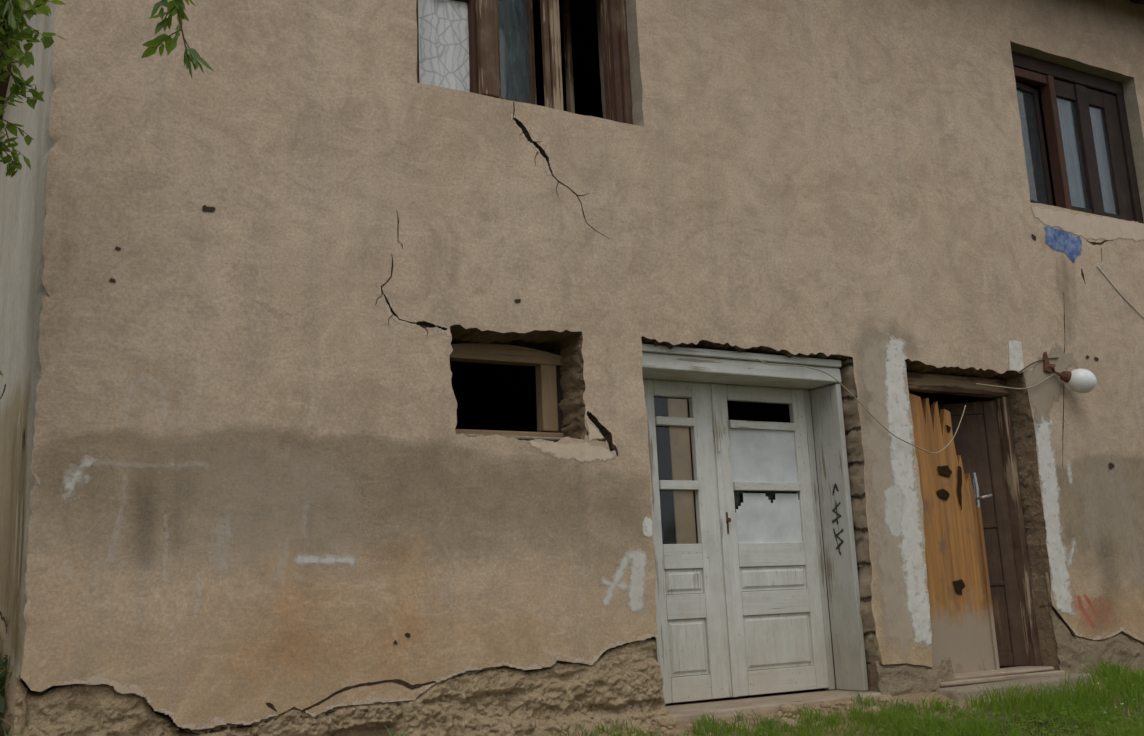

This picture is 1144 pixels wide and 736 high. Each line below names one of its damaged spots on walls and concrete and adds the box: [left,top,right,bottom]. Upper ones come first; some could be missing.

crack [508,102,608,238]
crack [374,209,451,339]
crack [585,405,623,456]
spalling [0,587,674,736]
spalling [1045,572,1144,676]